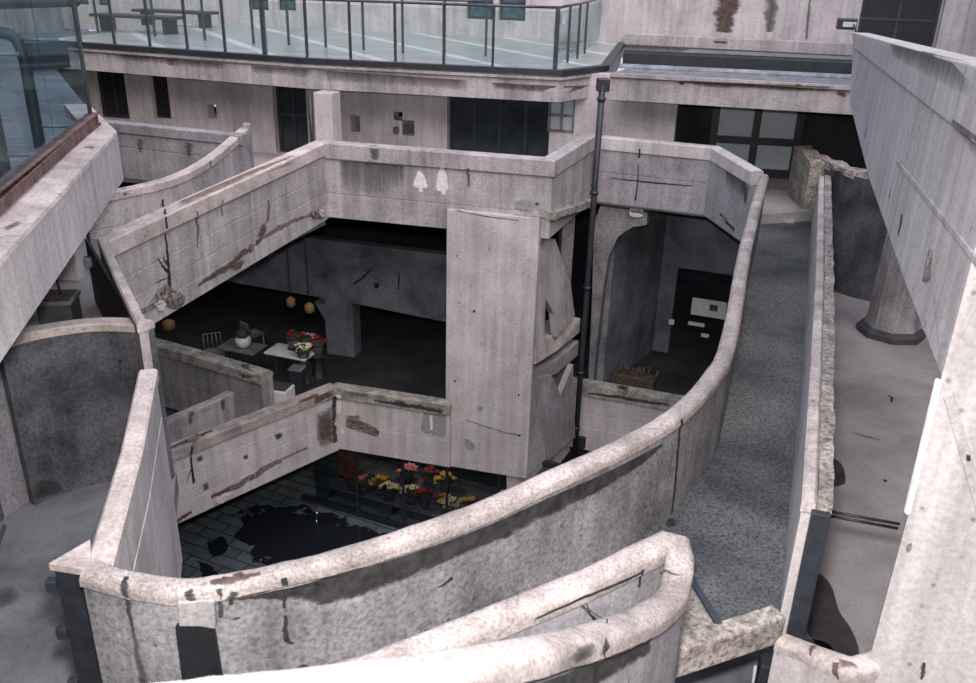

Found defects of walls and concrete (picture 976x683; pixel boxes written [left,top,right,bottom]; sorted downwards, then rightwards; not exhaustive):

leakage [766,0,777,32]
crack [611,149,692,200]
crack [157,199,172,287]
spalling [346,416,379,436]
crack [187,441,195,484]
spalling [211,447,308,504]
leakage [120,576,147,683]